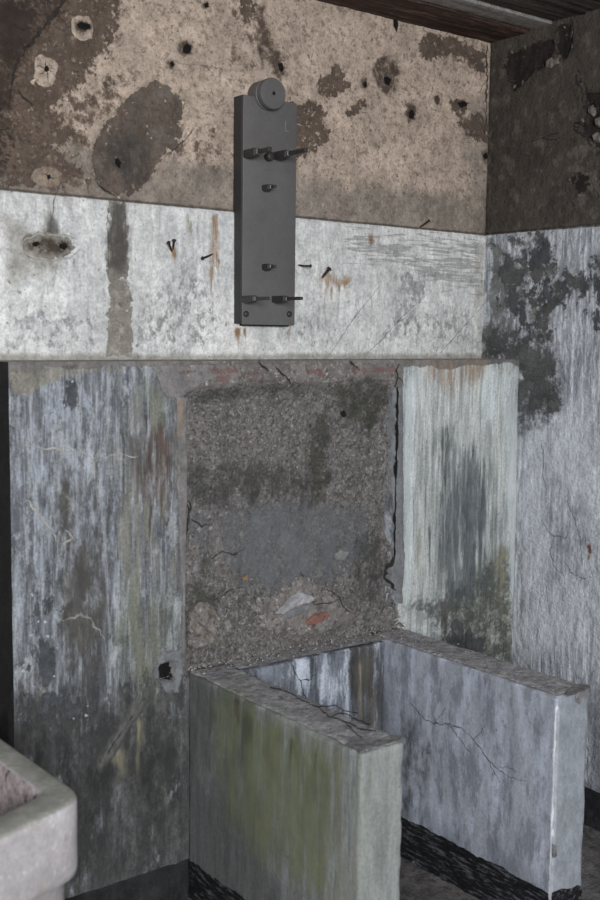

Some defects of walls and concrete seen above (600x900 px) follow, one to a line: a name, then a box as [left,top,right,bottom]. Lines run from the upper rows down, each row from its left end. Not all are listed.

flaking render [0,0,193,199]
spalling [23,231,79,262]
corrosion [210,216,220,284]
spalling [178,360,400,396]
damp [481,329,563,434]
crack [383,364,404,591]
damp [418,436,491,602]
damp [59,481,103,676]
spalling [246,569,359,641]
crack [270,664,376,738]
crack [412,704,526,782]
damp [63,717,178,878]